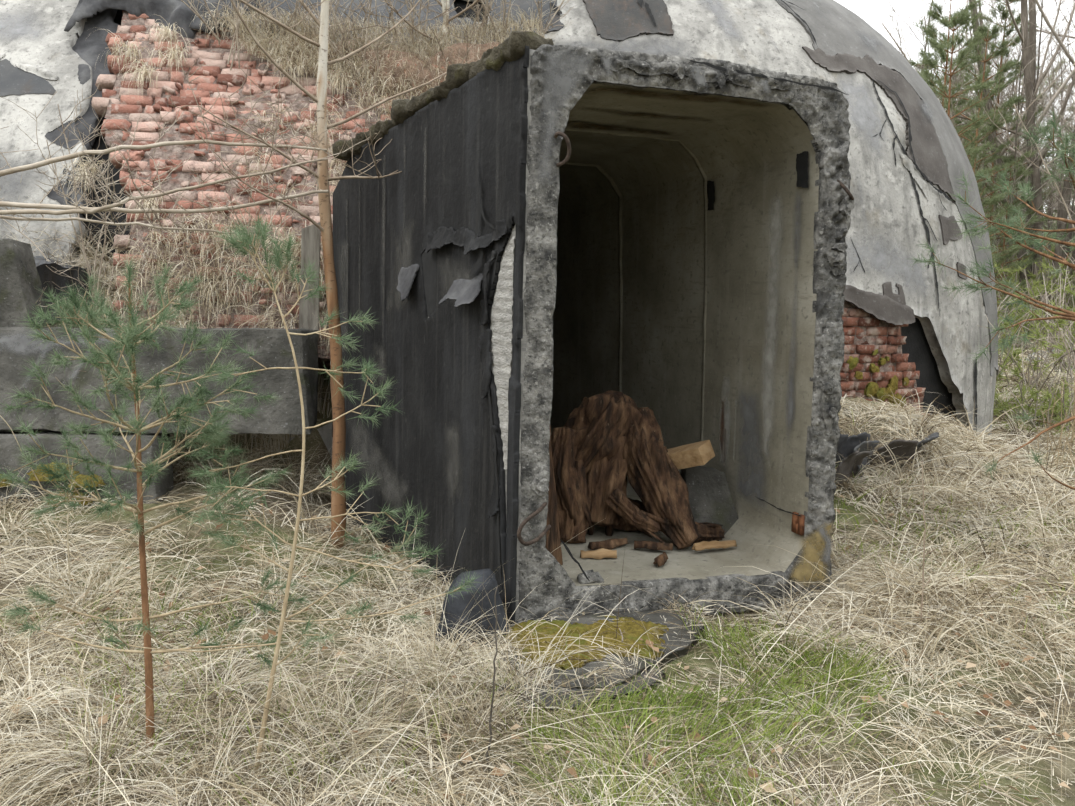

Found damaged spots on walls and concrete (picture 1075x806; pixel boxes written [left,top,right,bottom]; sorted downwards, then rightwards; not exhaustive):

spalling [0,53,59,96]
crack [687,59,848,95]
crack [872,80,956,313]
peeling [397,264,419,301]
peeling [425,219,515,518]